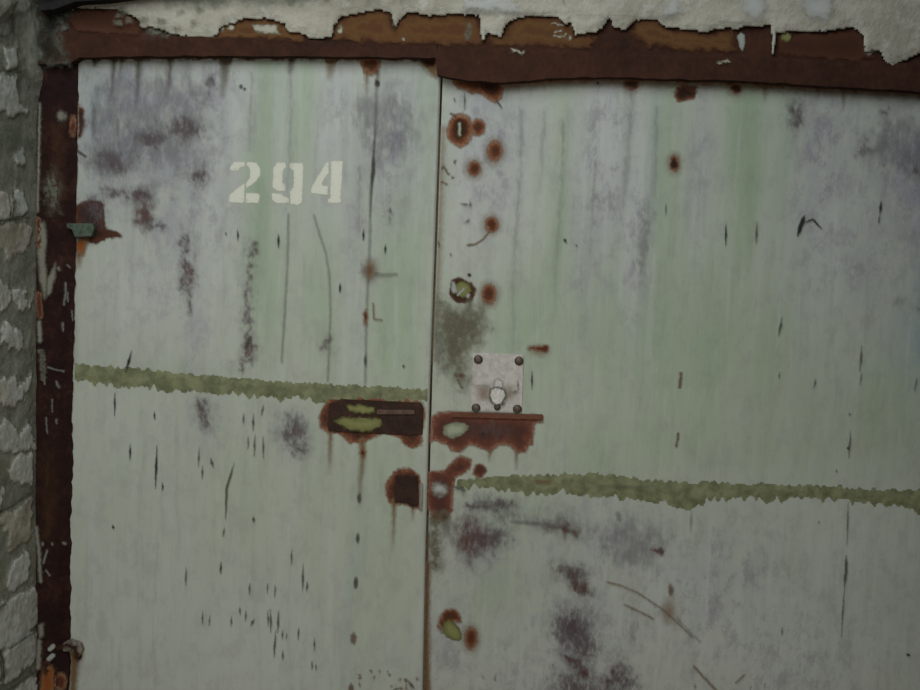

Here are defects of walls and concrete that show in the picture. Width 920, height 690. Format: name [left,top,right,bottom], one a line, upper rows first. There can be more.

spalling [68,8,140,36]
spalling [214,18,305,42]
spalling [329,10,597,54]
spalling [631,20,745,64]
spalling [775,30,875,61]
corrosion [44,107,85,211]
corrosion [446,113,502,176]
corrosion [75,196,121,259]
corrosion [449,273,496,304]
corrosion [319,398,542,690]
corrosion [40,652,82,690]